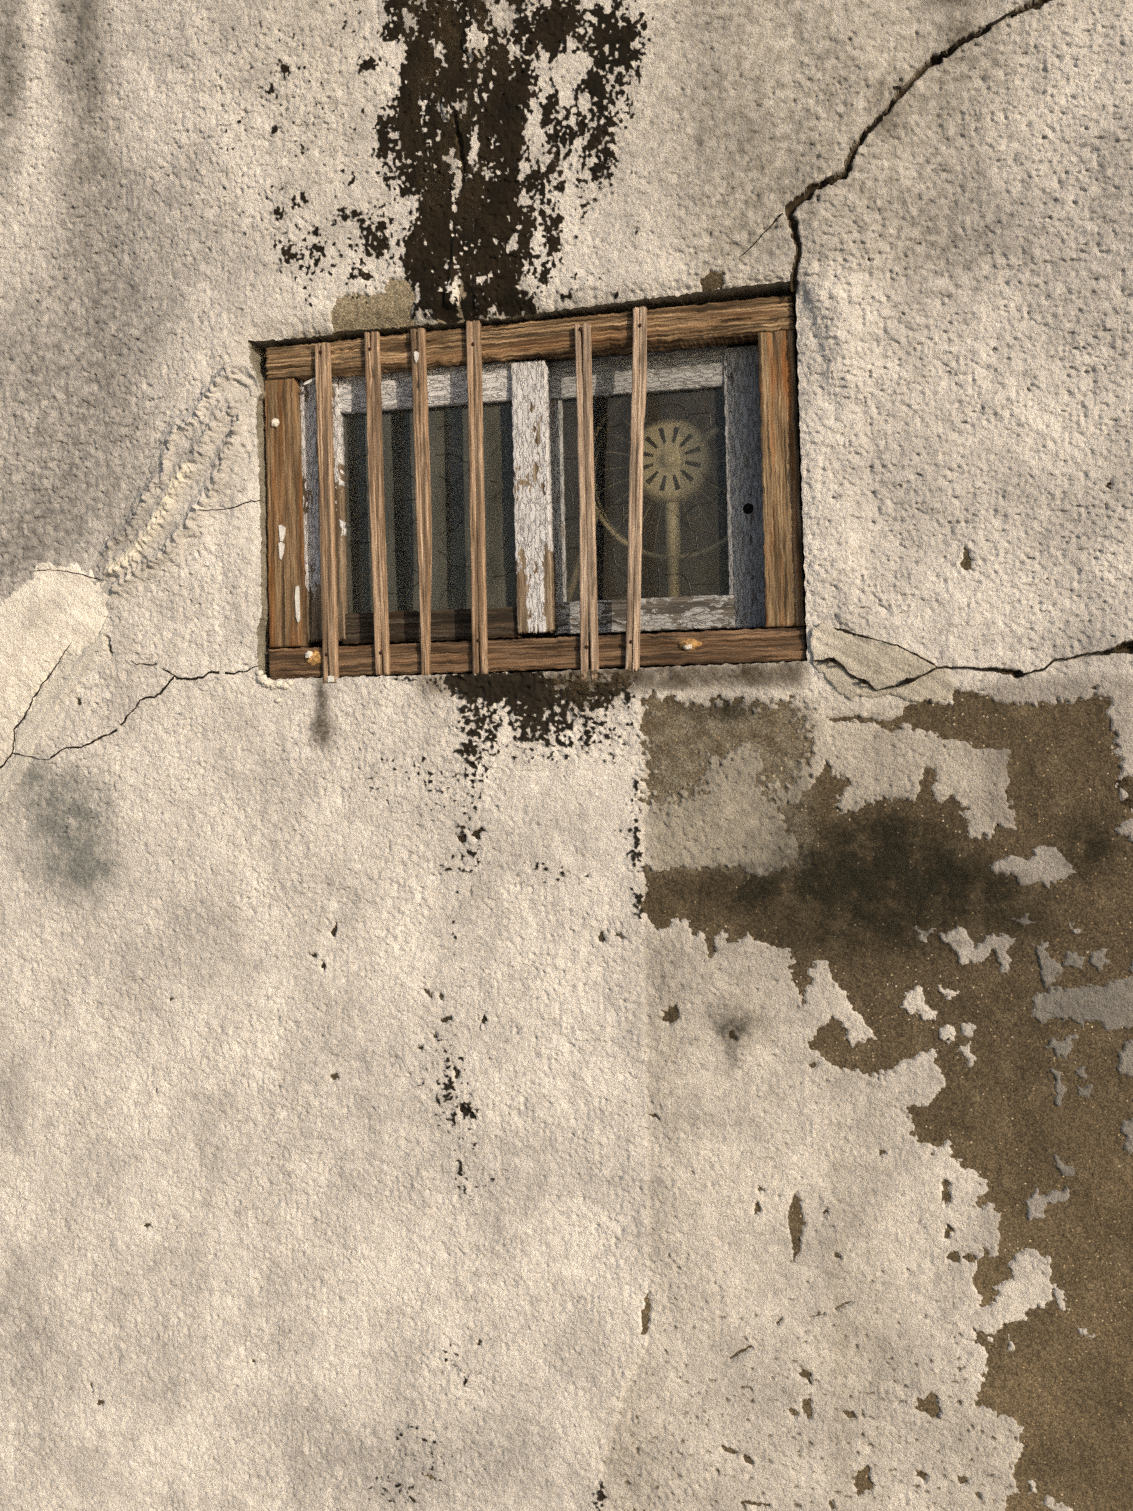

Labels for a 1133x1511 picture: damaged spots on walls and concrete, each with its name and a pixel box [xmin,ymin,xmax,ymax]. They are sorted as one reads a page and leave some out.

damp [263,0,654,324]
crack [739,0,1051,292]
crack [0,642,260,768]
damp [365,668,644,877]
damp [665,665,796,684]
crack [812,627,1133,691]
damp [631,887,649,919]
damp [699,814,1033,949]
flaking render [637,686,1133,1511]